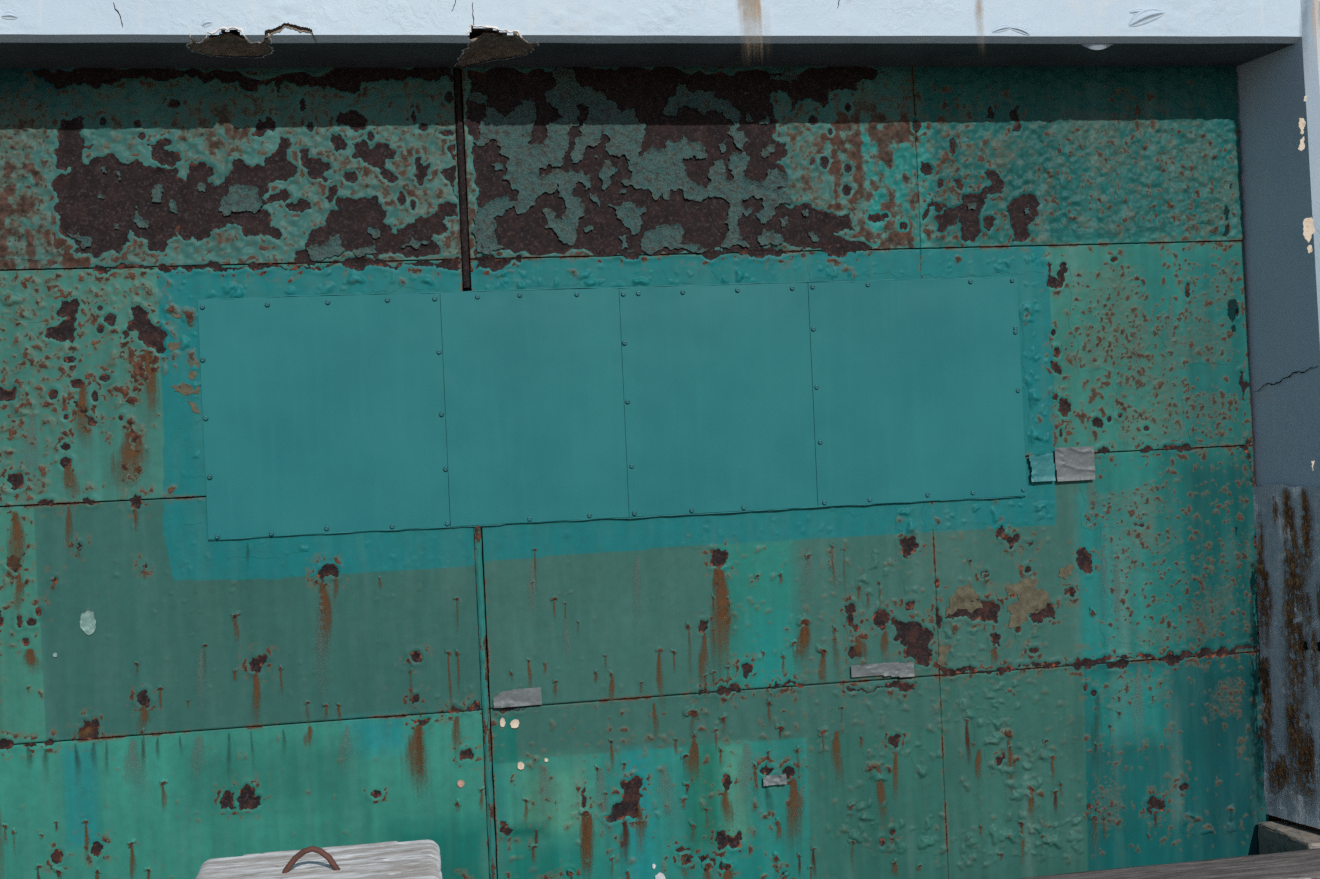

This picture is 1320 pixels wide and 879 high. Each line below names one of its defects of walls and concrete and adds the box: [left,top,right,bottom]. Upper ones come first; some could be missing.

peeling [986,105,1021,131]
peeling [33,22,877,274]
peeling [868,213,908,230]
peeling [920,161,1040,242]
crack [1254,366,1318,392]
rust [320,577,337,633]
rust [409,725,423,774]
rust [964,718,981,772]
rust [772,778,816,879]
rust [877,752,897,805]
rust [1017,737,1063,853]
rust [1087,782,1128,836]